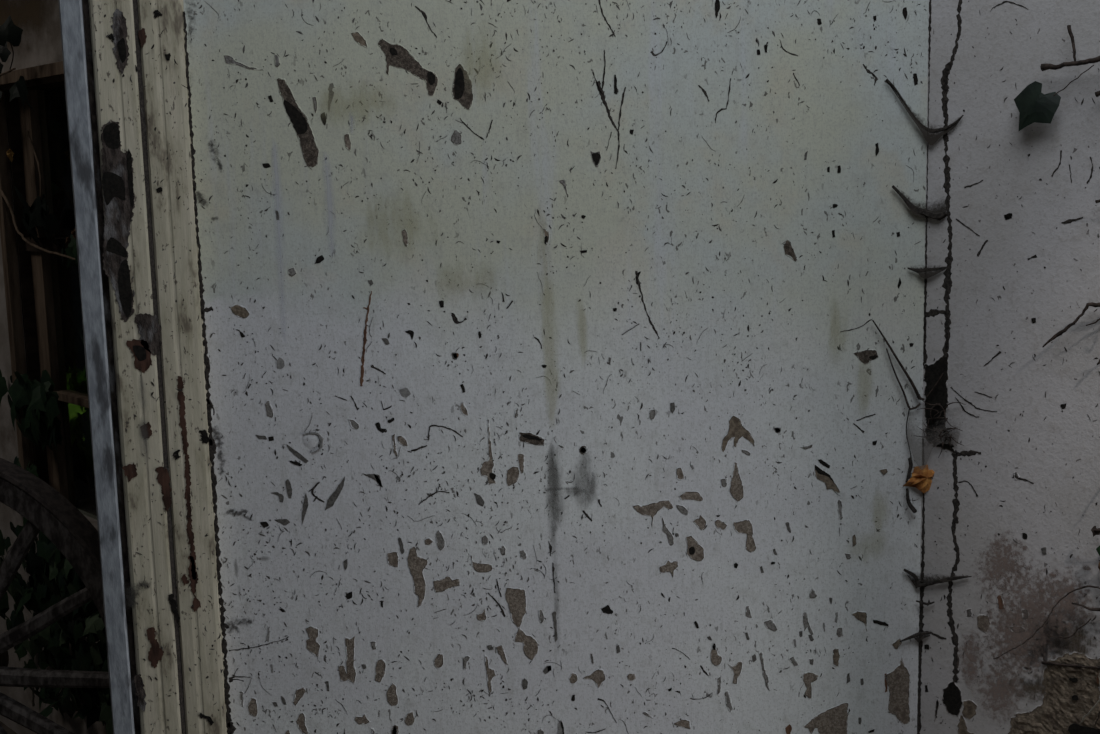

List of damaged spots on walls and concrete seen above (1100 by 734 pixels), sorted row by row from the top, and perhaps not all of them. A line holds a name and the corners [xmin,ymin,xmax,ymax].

flaking render [223,54,334,168]
flaking render [351,31,474,110]
crack [698,63,742,152]
crack [863,64,887,85]
crack [906,0,988,369]
peeling [101,121,162,373]
crack [950,387,997,417]
flaking render [721,415,755,502]
flaking render [387,530,460,607]
flaking render [632,467,757,577]
crack [917,450,981,734]
water stain [962,538,1096,719]